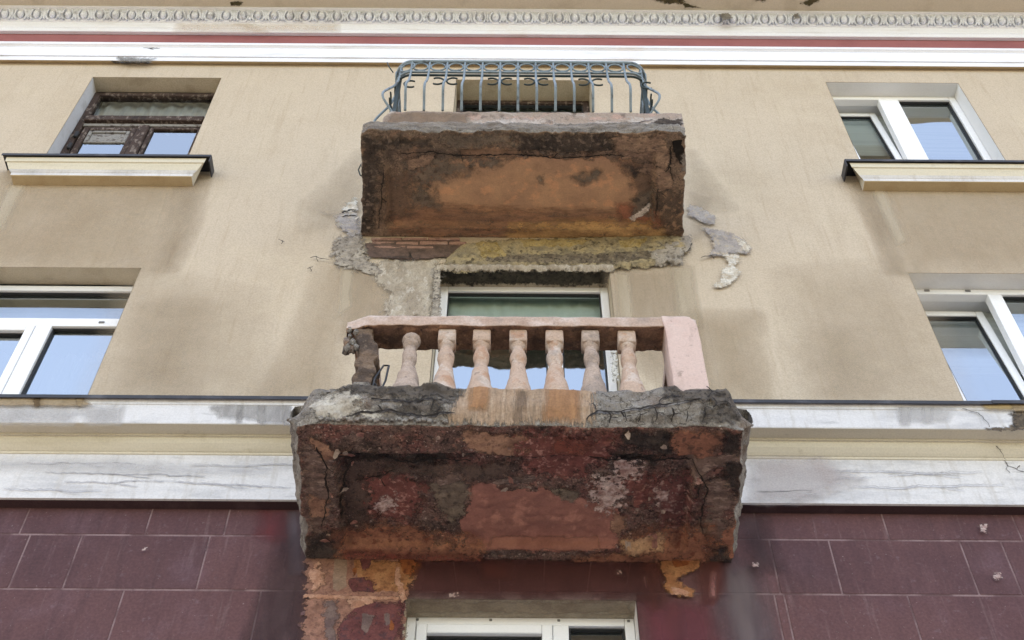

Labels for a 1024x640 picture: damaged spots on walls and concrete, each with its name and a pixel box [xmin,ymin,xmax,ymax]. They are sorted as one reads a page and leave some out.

damp [361,112,684,238]
crack [655,146,674,218]
spalling [329,197,692,316]
peeling [687,205,752,288]
crack [586,386,731,423]
crack [316,447,471,527]
peeling [298,382,742,558]
peeling [297,553,421,640]
peeling [660,559,700,597]